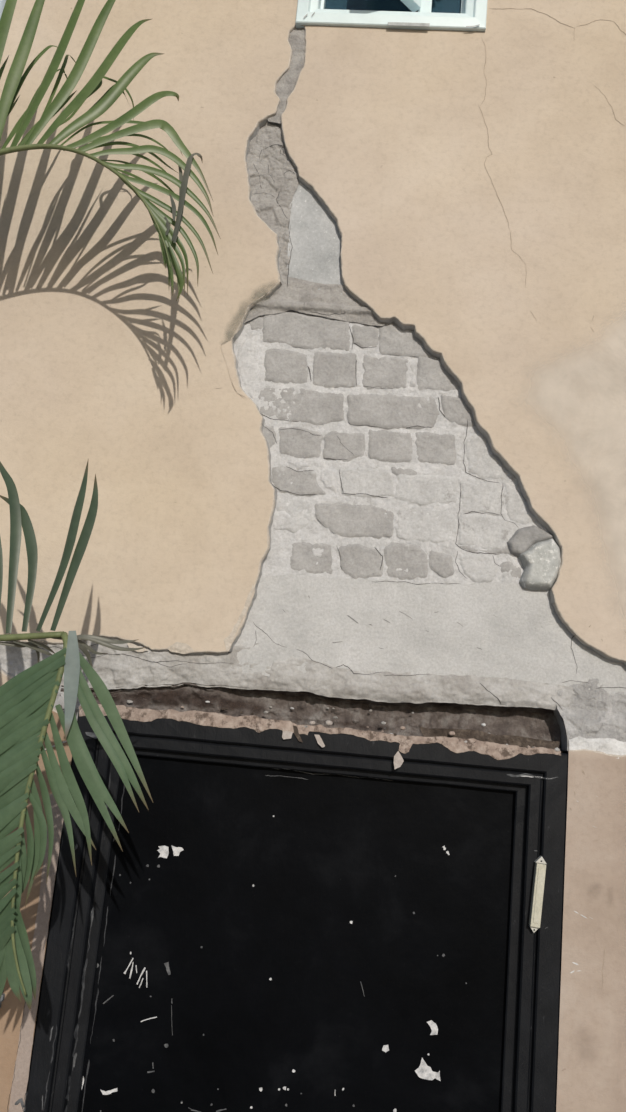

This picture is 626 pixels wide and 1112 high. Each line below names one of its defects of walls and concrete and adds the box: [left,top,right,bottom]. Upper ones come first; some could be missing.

flaking render [79,25,626,769]